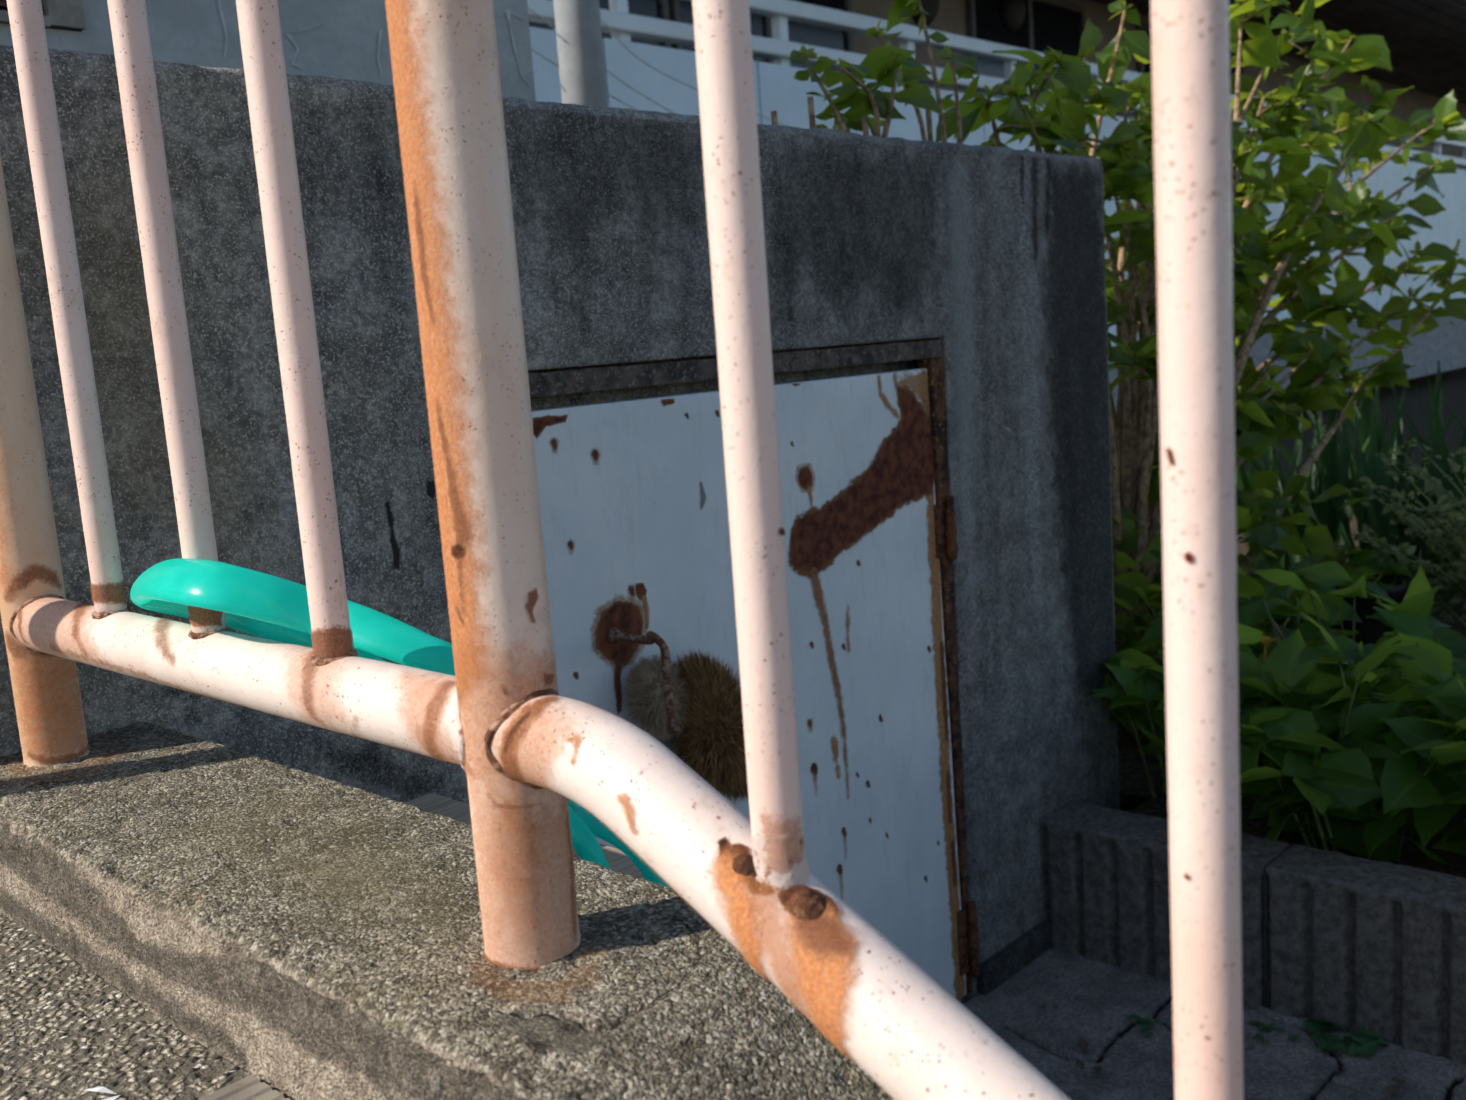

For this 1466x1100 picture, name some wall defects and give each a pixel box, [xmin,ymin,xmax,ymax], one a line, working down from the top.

rust [385,0,484,768]
rust [533,414,567,450]
rust [4,565,62,658]
rust [72,581,127,655]
rust [526,588,538,623]
rust [592,583,649,714]
rust [779,369,965,1002]
rust [27,744,90,765]
rust [499,673,559,794]
rust [567,735,580,765]
rust [483,953,539,972]